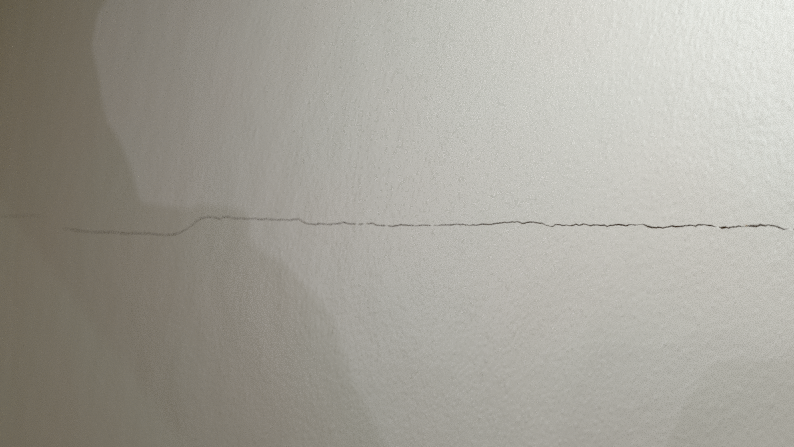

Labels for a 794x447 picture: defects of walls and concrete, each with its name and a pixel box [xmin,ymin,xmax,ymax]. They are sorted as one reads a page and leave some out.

crack [69,216,794,235]